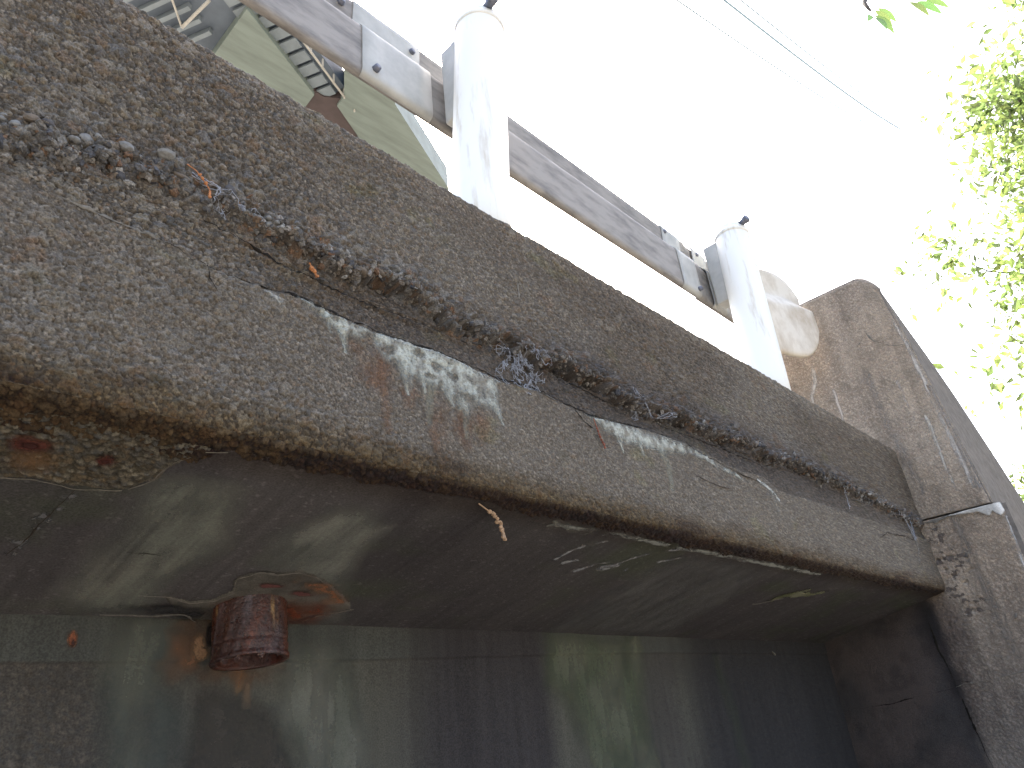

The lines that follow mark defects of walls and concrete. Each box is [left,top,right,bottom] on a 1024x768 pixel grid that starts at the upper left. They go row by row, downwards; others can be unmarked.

leakage [303,299,504,425]
crack [49,192,765,489]
leakage [591,417,714,490]
crack [7,490,76,556]
corrosion [173,624,212,668]